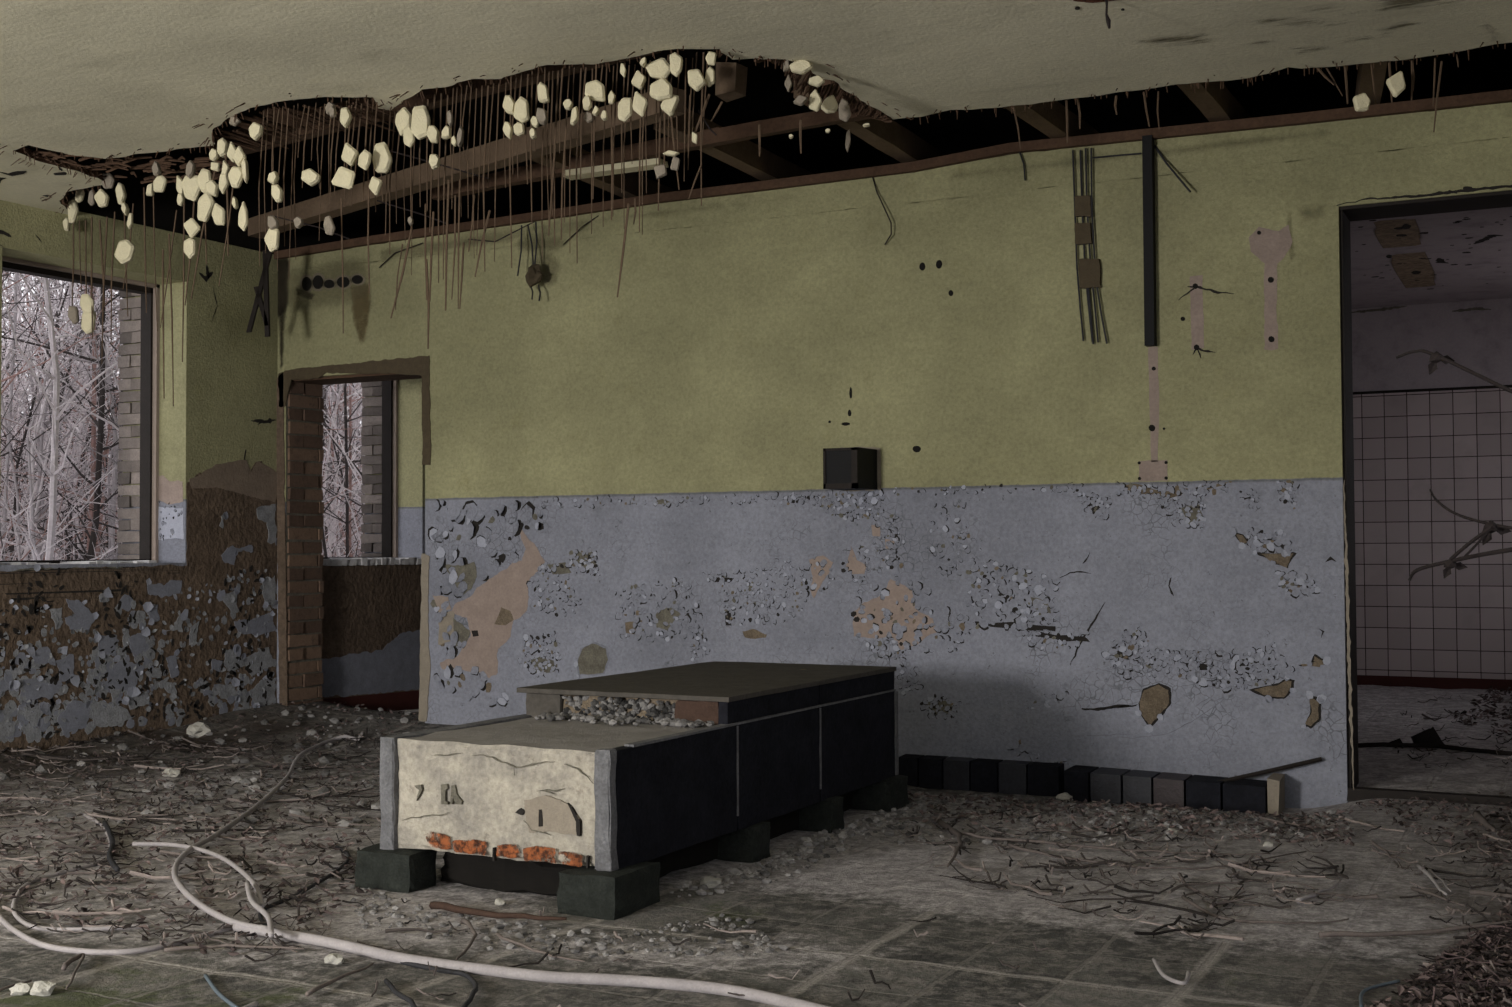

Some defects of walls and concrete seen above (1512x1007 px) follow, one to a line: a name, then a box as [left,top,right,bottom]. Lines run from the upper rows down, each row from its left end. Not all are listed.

peeling [0,460,278,752]
flaking render [321,347,1331,733]